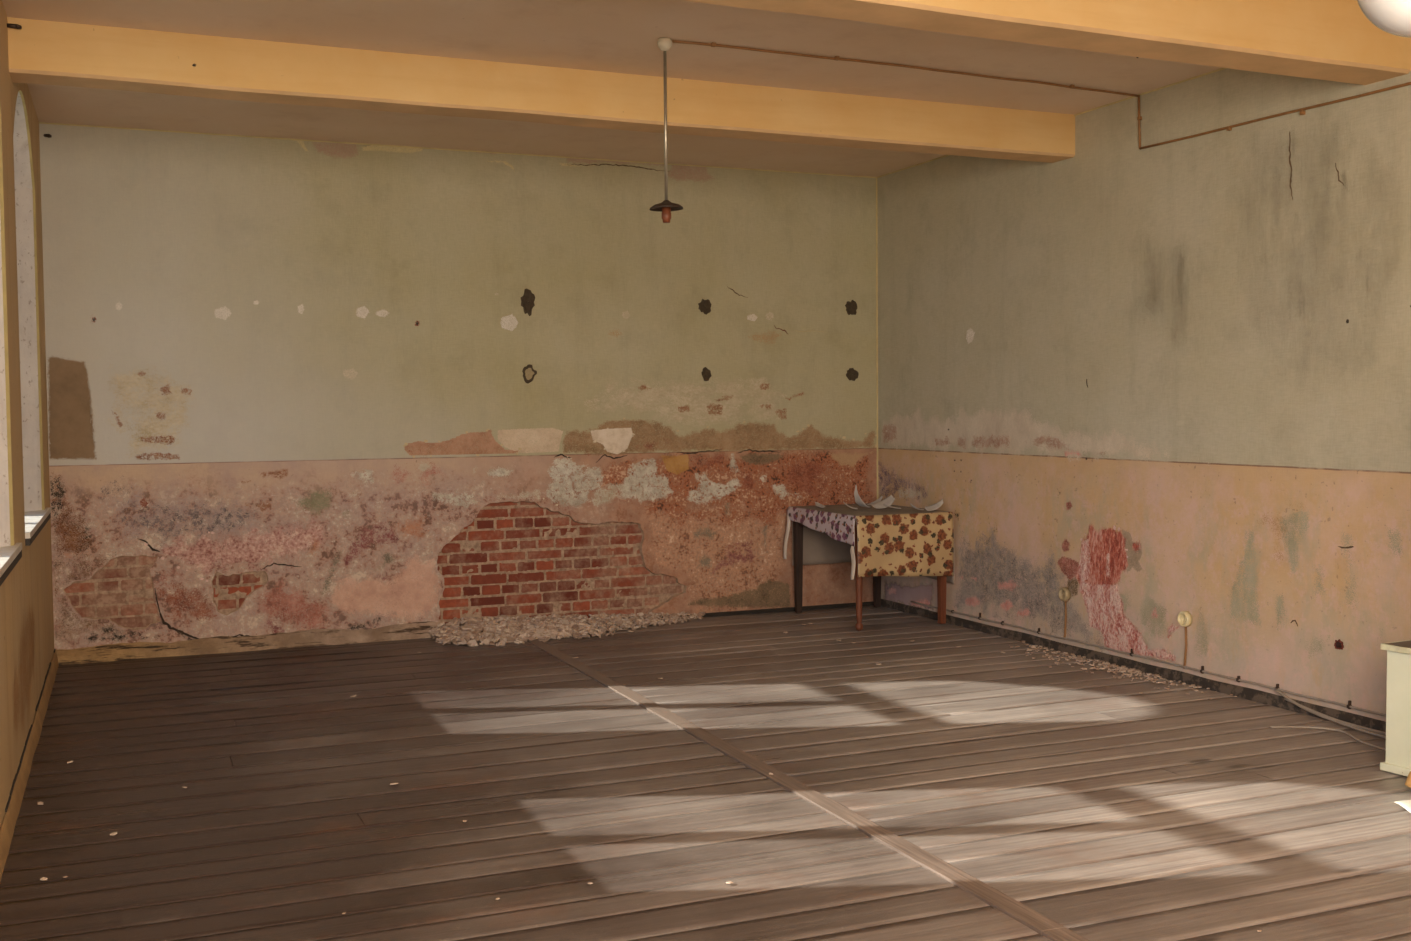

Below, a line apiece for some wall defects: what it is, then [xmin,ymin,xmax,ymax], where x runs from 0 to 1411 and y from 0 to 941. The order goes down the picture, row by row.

crack [1287,133,1295,200]
spalling [521,289,535,316]
peeling [392,418,877,485]
crack [155,589,249,639]
spalling [211,571,268,615]
spalling [437,501,687,624]
leakage [950,510,1104,652]
peeling [1057,524,1179,663]